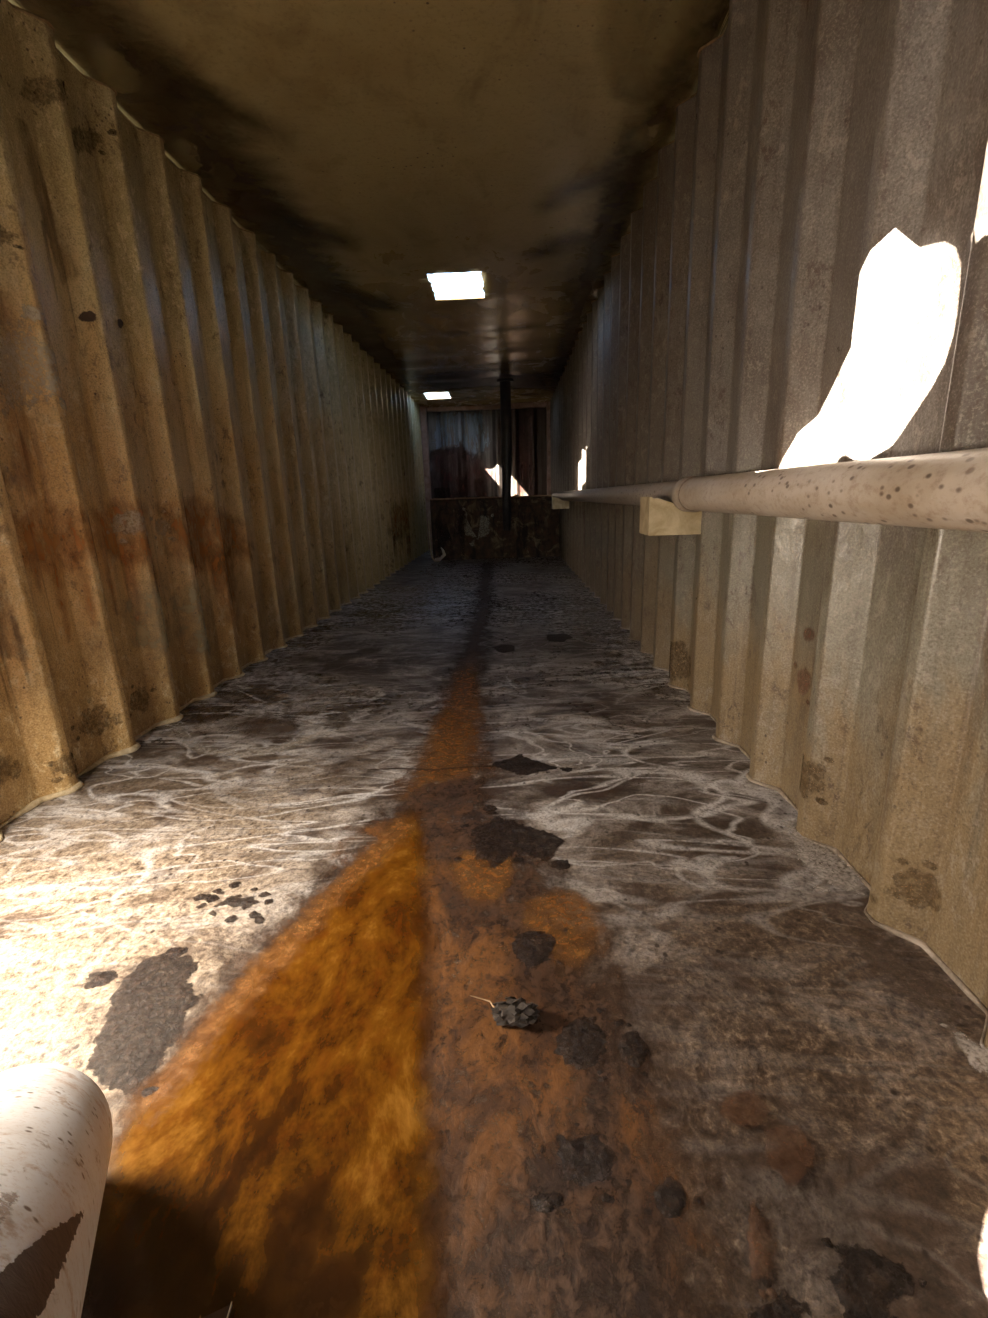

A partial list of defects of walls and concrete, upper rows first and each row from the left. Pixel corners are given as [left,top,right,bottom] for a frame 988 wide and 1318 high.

leakage [37,0,729,390]
leakage [780,821,874,902]
leakage [887,858,939,911]
corrosion [107,563,778,1318]
corrosion [81,1265,99,1318]